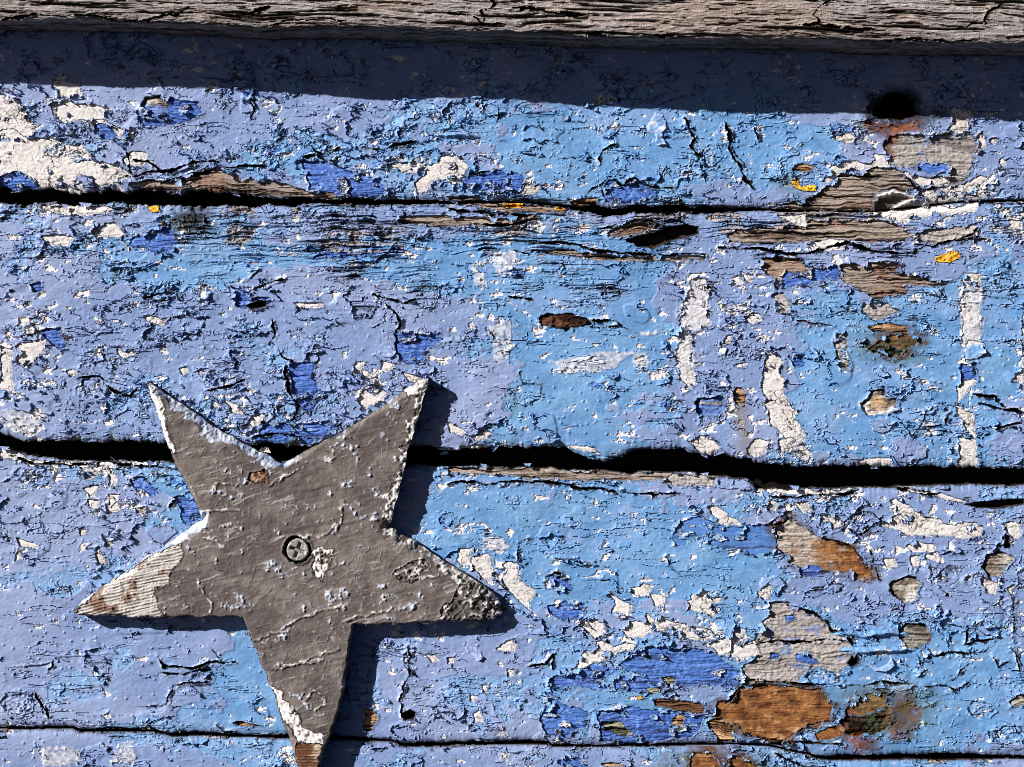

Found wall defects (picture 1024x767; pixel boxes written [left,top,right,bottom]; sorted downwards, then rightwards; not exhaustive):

peeling [0,74,569,255]
crack [684,117,703,176]
crack [448,208,986,257]
crack [725,123,759,189]
peeling [723,105,999,325]
peeling [285,358,321,411]
peeling [747,348,813,457]
peeling [953,273,986,467]
peeling [799,564,824,579]
peeling [539,574,856,745]